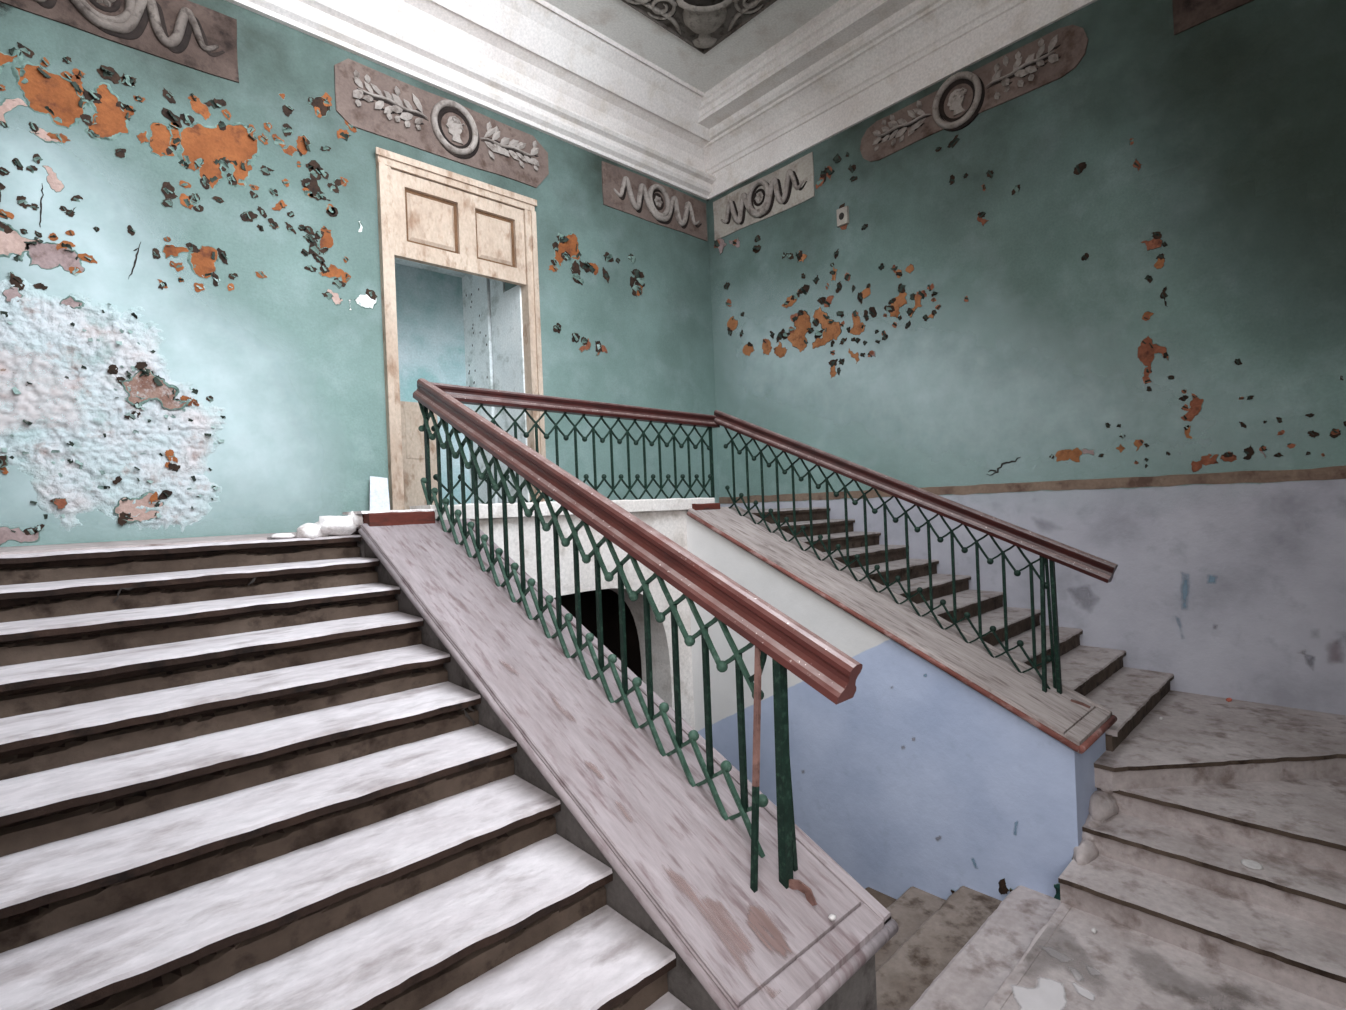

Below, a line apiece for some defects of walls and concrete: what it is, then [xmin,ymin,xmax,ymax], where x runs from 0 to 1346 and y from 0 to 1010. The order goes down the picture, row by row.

peeling [0,42,378,311]
peeling [549,232,645,297]
peeling [553,323,608,356]
peeling [724,249,941,378]
peeling [1137,232,1204,439]
spalling [107,362,214,420]
spalling [165,449,181,472]
peeling [1049,423,1149,468]
peeling [1191,413,1346,472]
spalling [50,498,68,509]
spalling [112,476,172,526]
spalling [0,524,45,546]